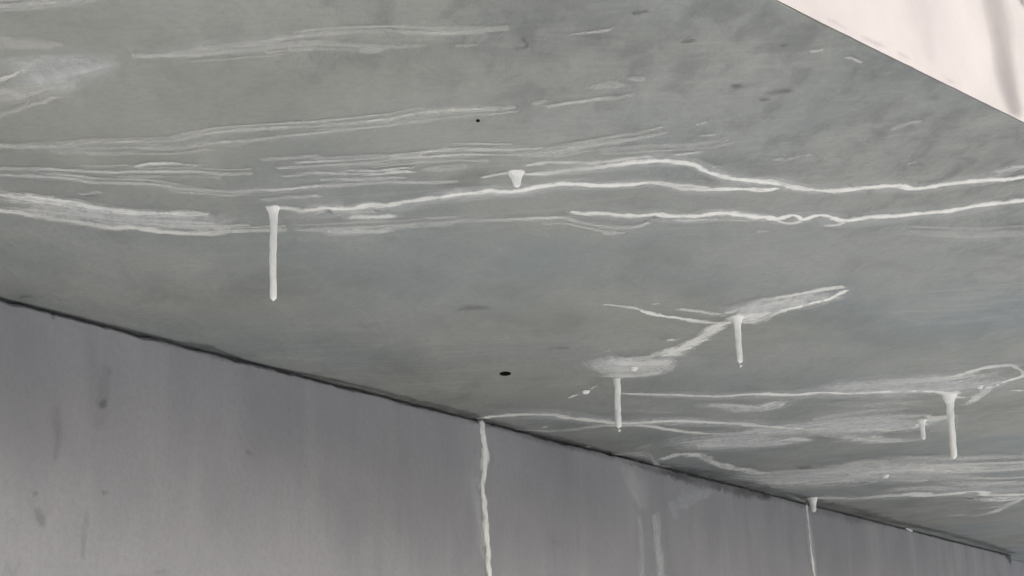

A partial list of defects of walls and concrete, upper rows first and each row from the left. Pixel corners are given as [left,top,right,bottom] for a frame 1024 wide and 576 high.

damp [0,192,230,236]
crack [280,156,1024,227]
damp [593,285,849,378]
damp [703,401,787,412]
damp [658,415,1024,494]